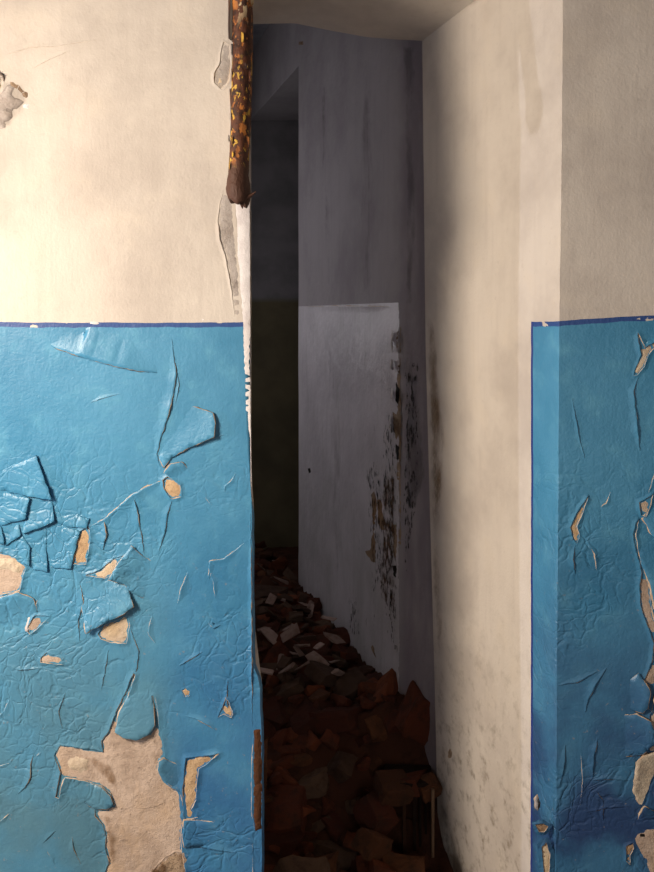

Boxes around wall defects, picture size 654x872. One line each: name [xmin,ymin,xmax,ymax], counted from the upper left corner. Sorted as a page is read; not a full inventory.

flaking render [0,71,29,129]
flaking render [215,192,251,484]
peeling [631,329,654,379]
peeling [0,455,151,647]
mould [366,364,419,643]
peeling [566,492,611,574]
peeling [3,650,65,671]
peeling [216,696,237,720]
peeling [622,490,654,872]
peeling [50,667,224,872]
peeling [532,794,555,872]